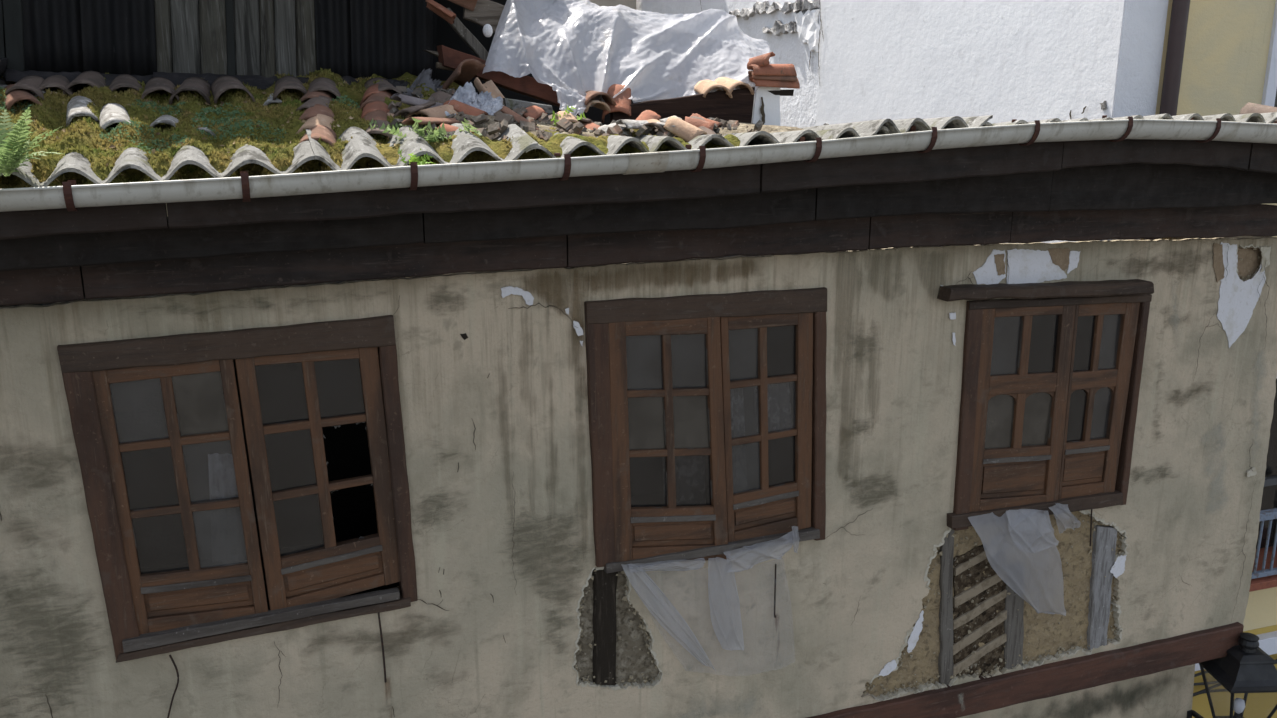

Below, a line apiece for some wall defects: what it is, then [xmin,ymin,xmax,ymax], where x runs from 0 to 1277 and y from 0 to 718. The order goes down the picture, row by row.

flaking render [501,286,534,305]
flaking render [565,308,583,345]
flaking render [973,248,1080,285]
flaking render [1213,242,1271,348]
flaking render [572,567,663,691]
flaking render [863,510,1129,701]